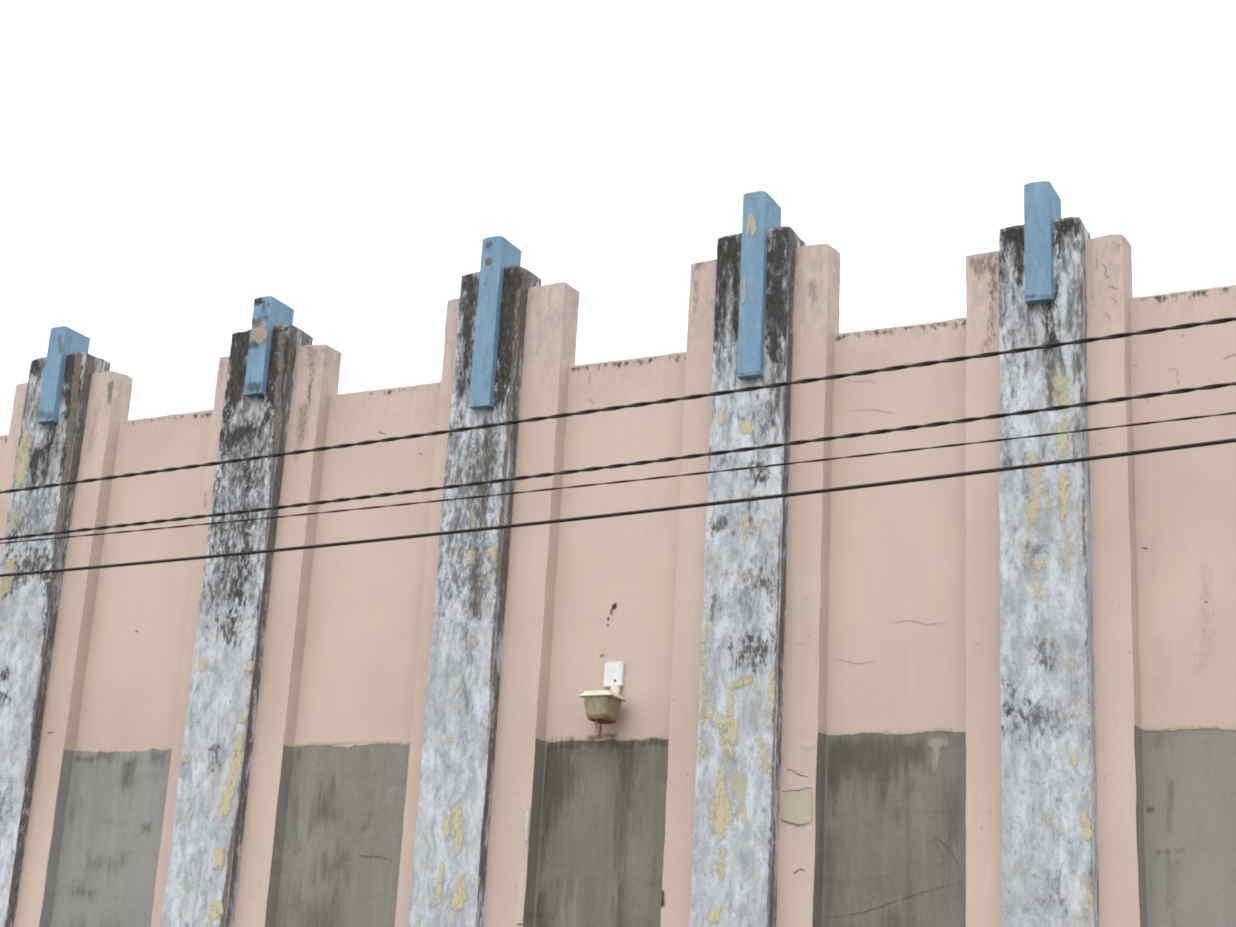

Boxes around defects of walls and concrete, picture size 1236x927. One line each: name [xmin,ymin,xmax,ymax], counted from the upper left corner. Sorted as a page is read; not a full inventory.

leakage [28,353,83,486]
leakage [151,314,289,647]
spalling [263,330,286,568]
leakage [450,273,479,407]
leakage [694,235,740,352]
leakage [764,228,798,369]
leakage [970,227,1061,407]
peeling [1022,247,1087,590]
peeling [205,694,250,927]
peeling [432,804,467,927]
peeling [697,457,783,927]
peeling [1062,605,1093,927]